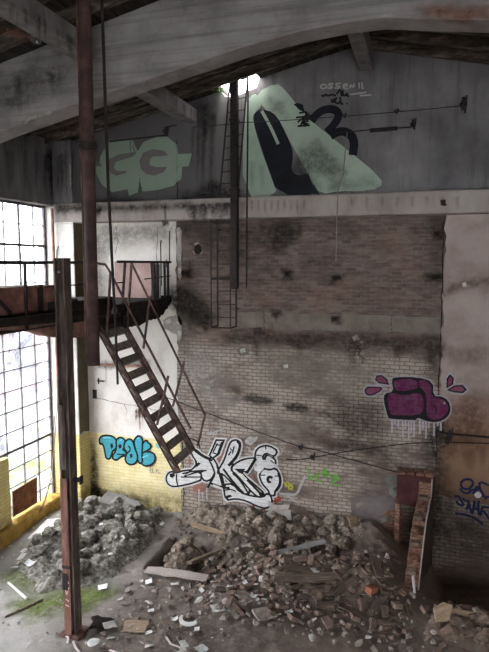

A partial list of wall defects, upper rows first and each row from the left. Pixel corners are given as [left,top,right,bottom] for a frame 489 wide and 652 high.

leakage [226,330,441,354]